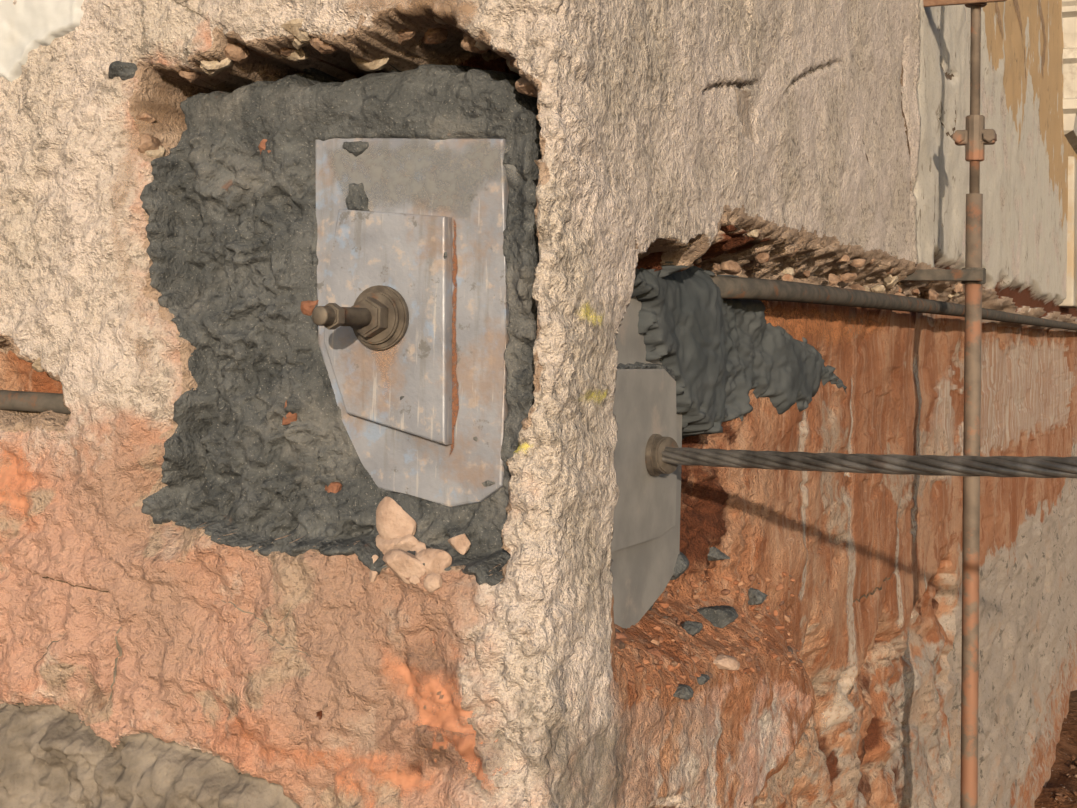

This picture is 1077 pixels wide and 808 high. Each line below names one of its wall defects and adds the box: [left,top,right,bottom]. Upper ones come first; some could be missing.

spalling [130,2,547,315]
crack [704,81,751,90]
crack [783,62,832,95]
crack [900,65,912,191]
peeling [980,0,1074,247]
flaking render [614,203,965,354]
water stain [798,411,808,452]
water stain [800,471,808,532]
water stain [823,492,857,732]
spalling [737,544,960,808]
water stain [895,475,920,697]
peeling [980,284,1077,457]